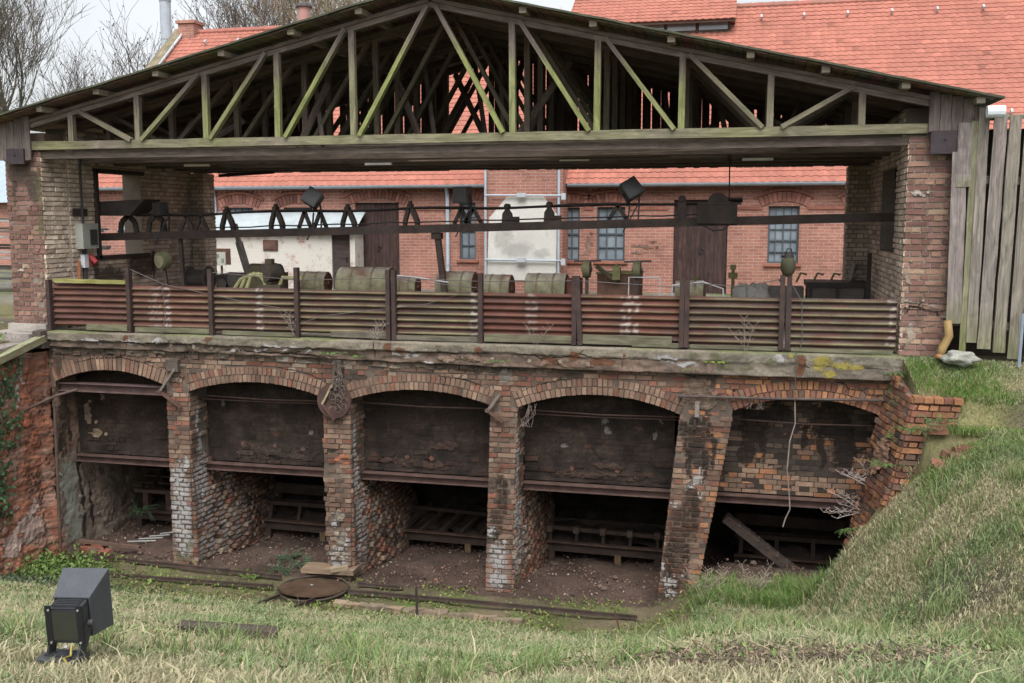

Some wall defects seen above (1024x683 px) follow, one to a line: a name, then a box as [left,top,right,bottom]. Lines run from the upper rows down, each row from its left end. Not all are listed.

flaking render [0,497,46,558]
spalling [11,360,38,451]
water stain [170,402,252,563]
water stain [329,416,399,566]
water stain [486,432,528,588]
water stain [659,435,717,600]